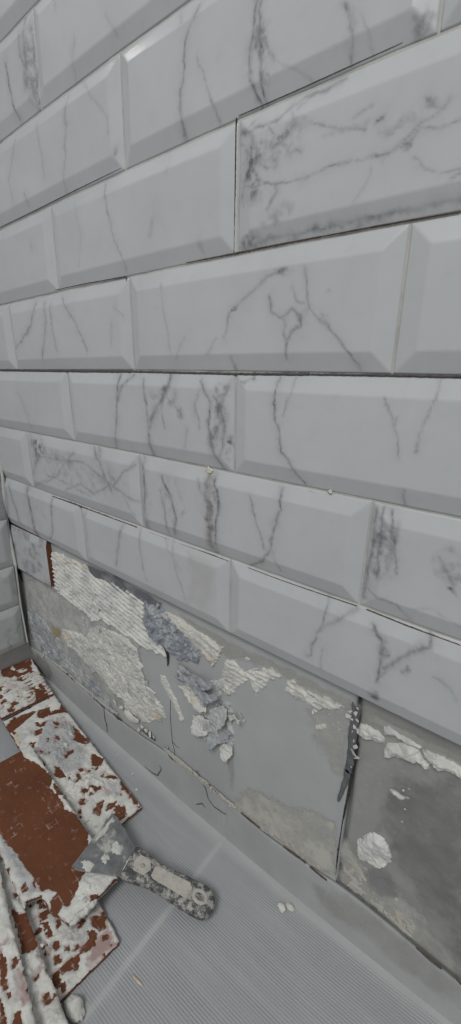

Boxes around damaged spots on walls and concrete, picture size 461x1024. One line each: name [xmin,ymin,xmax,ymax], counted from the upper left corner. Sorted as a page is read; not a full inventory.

spalling [304,693,360,768]